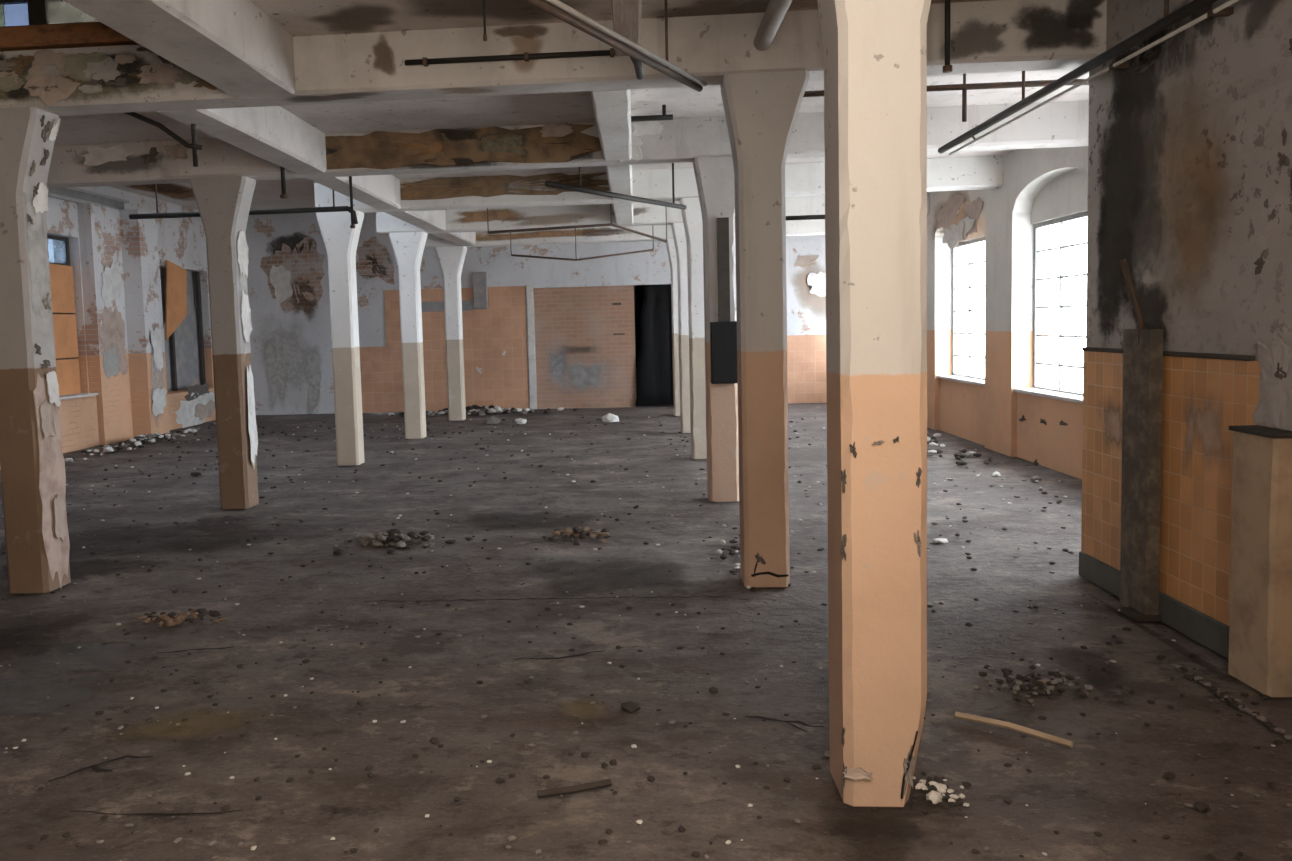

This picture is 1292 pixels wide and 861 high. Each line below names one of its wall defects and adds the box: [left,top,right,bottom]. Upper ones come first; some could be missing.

water stain [668,0,770,18]
water stain [950,24,1000,58]
water stain [1019,0,1104,48]
peeling [0,47,217,310]
water stain [1098,4,1212,342]
peeling [1278,129,1292,213]
flaking render [237,230,325,342]
spalling [1254,248,1269,275]
peeling [247,365,258,468]